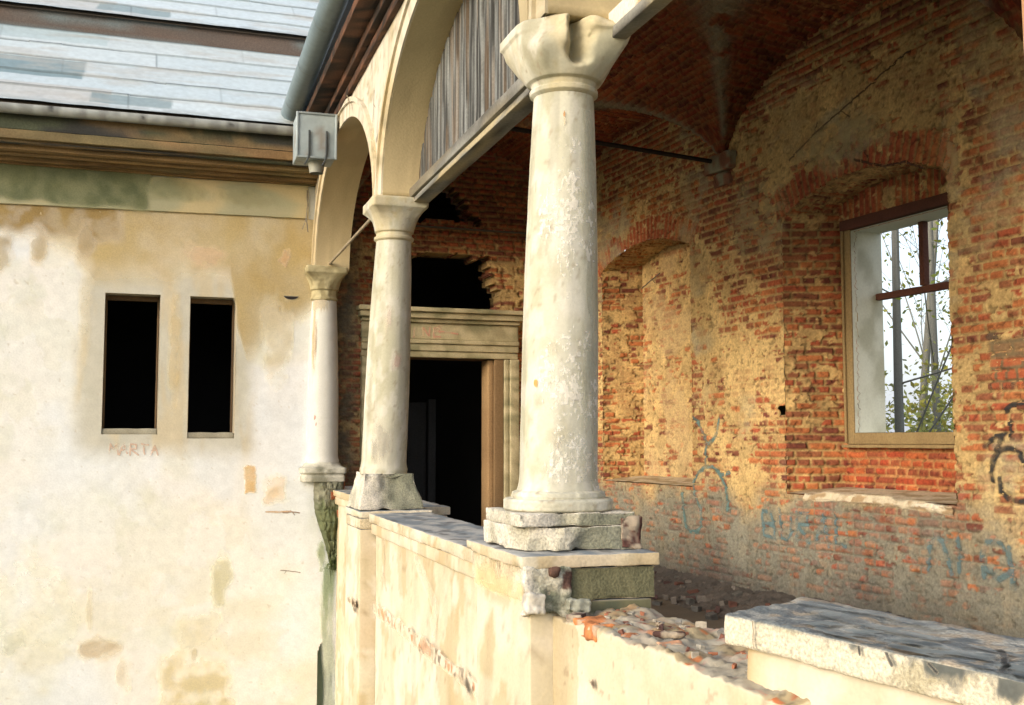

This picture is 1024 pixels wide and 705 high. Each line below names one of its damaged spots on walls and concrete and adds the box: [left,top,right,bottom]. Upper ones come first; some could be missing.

damp [0,163,326,366]
peeling [539,110,600,491]
spalling [986,332,1024,390]
flaking render [244,465,291,513]
spalling [803,492,953,516]
spalling [520,566,592,617]